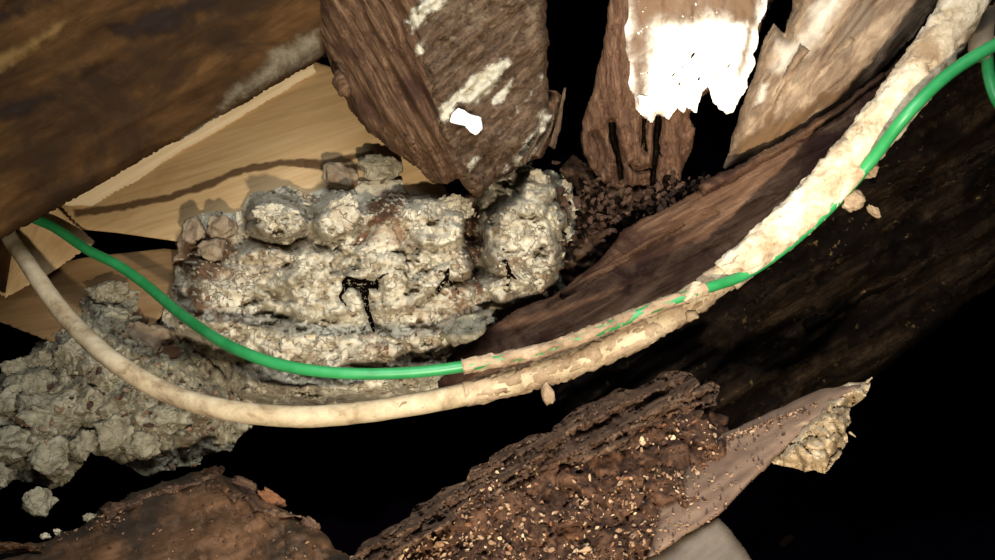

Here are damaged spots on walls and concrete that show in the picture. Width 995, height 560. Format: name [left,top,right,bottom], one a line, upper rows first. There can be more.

crack [339,273,389,332]